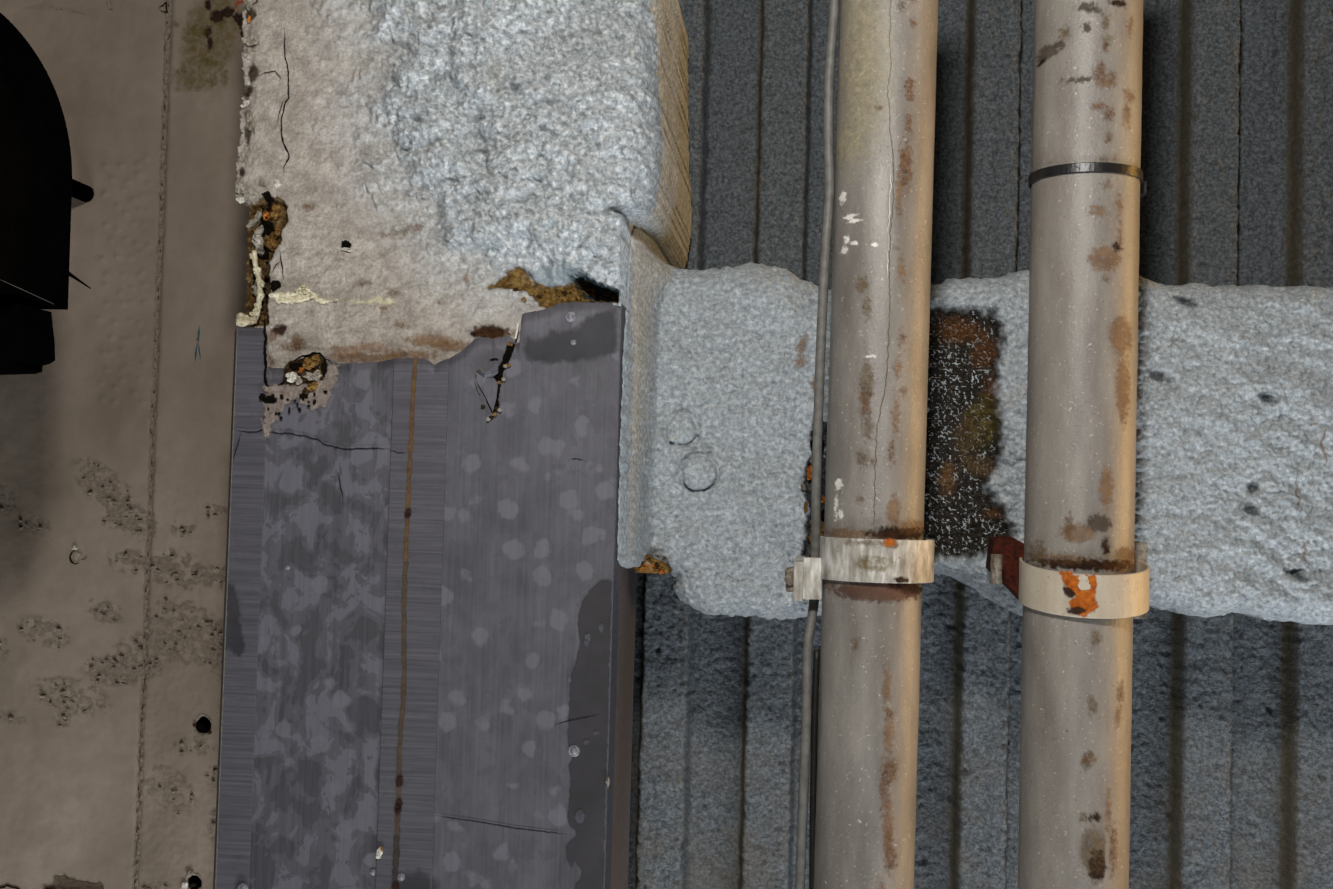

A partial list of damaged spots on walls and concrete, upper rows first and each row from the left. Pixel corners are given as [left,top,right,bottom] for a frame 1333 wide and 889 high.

corrosion [1036,29,1068,67]
corrosion [1067,0,1127,83]
crack [261,28,290,174]
flaking render [488,263,619,308]
spalling [259,352,339,438]
corrosion [859,363,873,439]
corrosion [823,526,924,604]
corrosion [1027,515,1135,617]
corrosion [391,358,418,889]
water stain [567,580,612,889]
spalling [45,875,103,889]
corrosion [1081,813,1117,880]